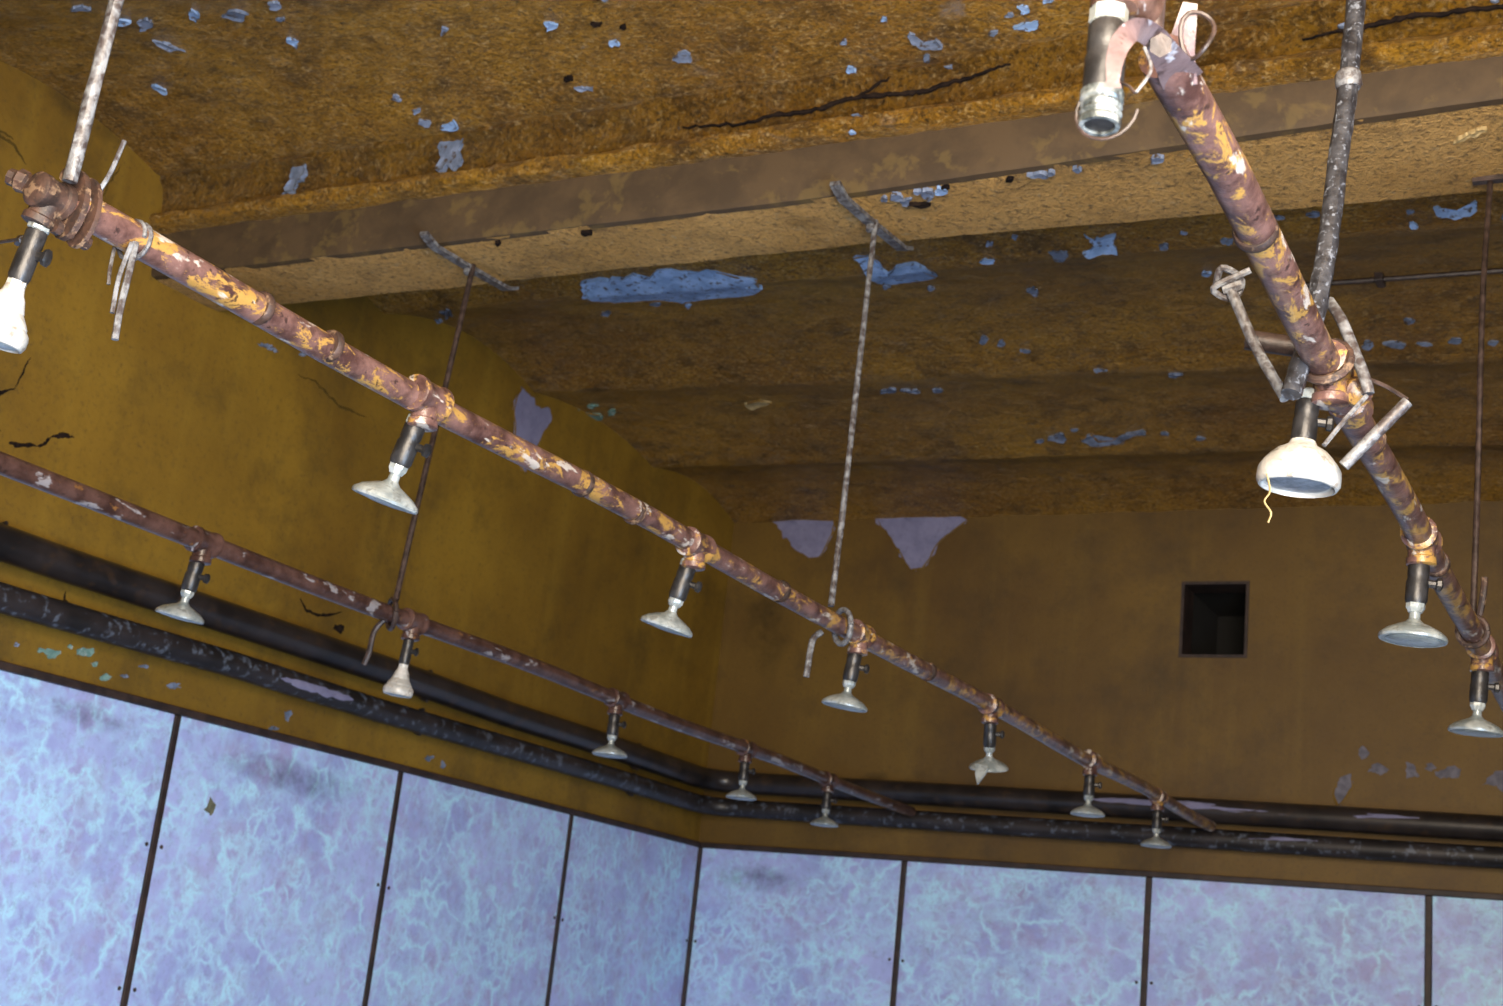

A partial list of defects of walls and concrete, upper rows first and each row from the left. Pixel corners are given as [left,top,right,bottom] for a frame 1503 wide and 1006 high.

peeling [118,17,186,52]
peeling [188,8,200,23]
peeling [222,9,249,22]
peeling [267,0,299,49]
crack [1302,4,1503,41]
crack [682,63,1011,129]
peeling [391,94,464,173]
peeling [580,268,763,317]
crack [0,357,75,448]
peeling [513,386,552,447]
peeling [773,520,835,558]
peeling [876,516,968,571]